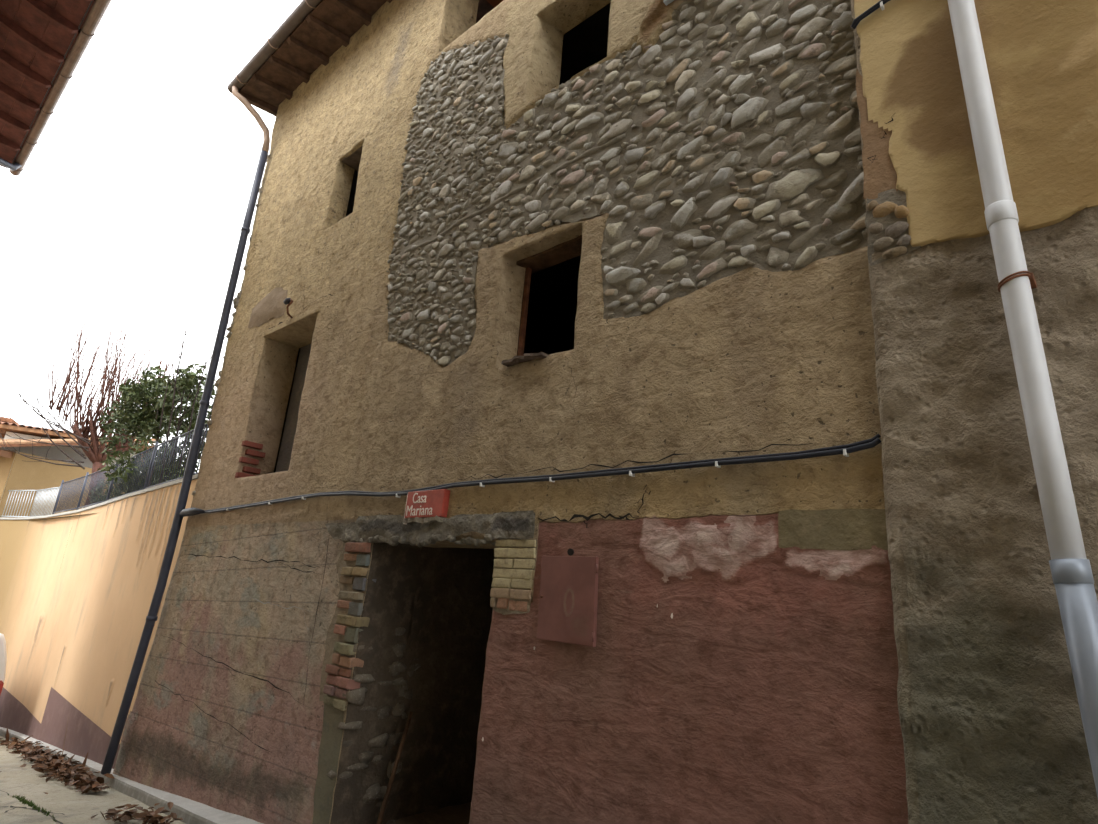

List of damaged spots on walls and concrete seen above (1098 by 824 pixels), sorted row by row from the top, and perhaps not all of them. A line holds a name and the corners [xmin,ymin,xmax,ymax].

flaking render [856,69,921,266]
damp [867,0,978,175]
damp [974,0,1045,158]
crack [162,539,329,703]
peeling [636,510,891,585]
crack [159,684,272,753]